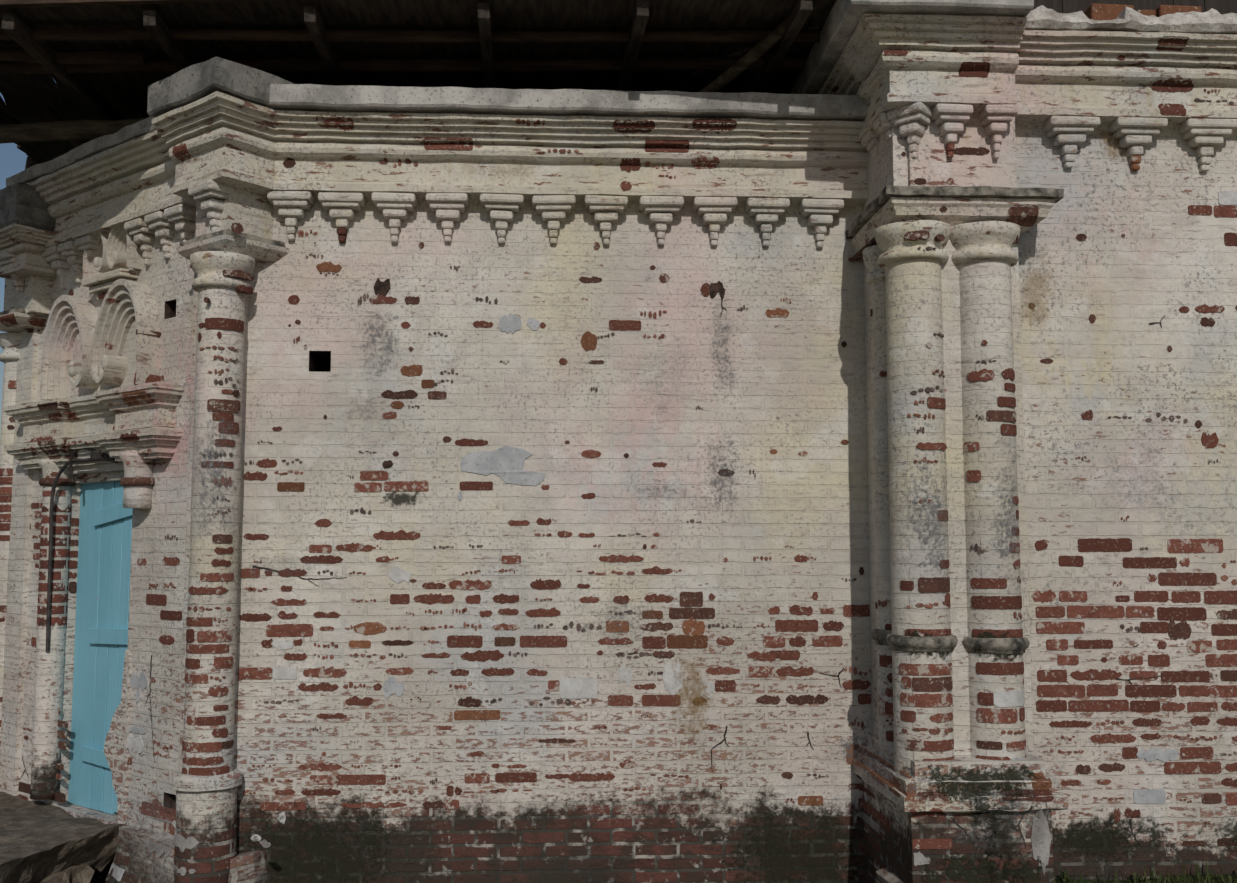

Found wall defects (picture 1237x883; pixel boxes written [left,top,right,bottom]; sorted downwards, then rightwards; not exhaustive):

flaking render [612,118,737,191]
flaking render [1188,205,1237,246]
spalling [357,278,420,306]
spalling [288,320,331,372]
flaking render [581,310,667,364]
flaking render [198,318,305,515]
flaking render [966,359,1017,436]
flaking render [348,451,429,492]
flaking render [900,559,951,609]
flaking render [971,496,1237,823]
flaking render [842,655,955,761]
flaking render [243,751,689,811]